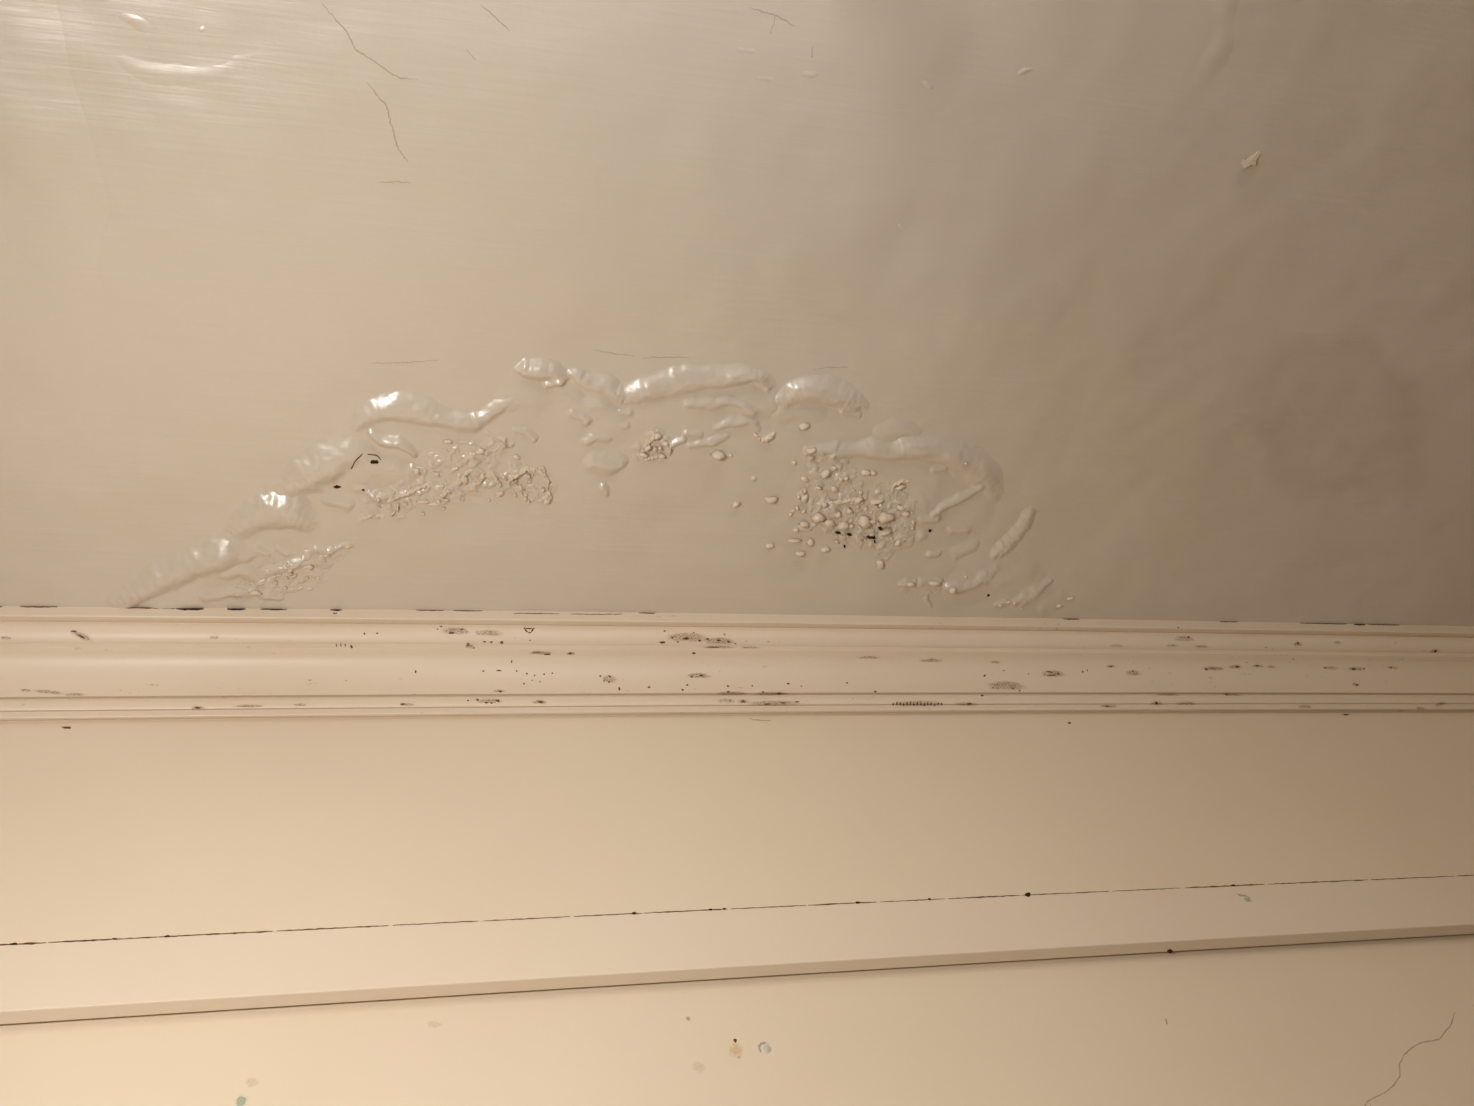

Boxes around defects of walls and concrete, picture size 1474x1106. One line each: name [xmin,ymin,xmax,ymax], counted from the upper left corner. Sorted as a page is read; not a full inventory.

peeling [359,437,558,522]
peeling [764,447,932,569]
crack [1365,1012,1455,1106]